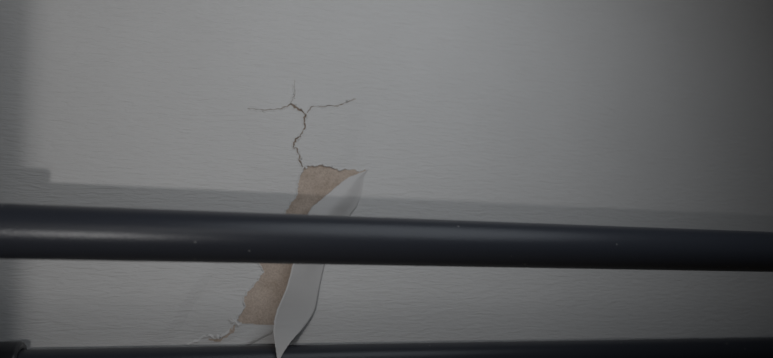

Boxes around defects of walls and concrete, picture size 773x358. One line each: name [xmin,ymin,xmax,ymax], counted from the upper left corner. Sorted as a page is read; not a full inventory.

crack [247,80,356,169]
peeling [283,163,368,216]
peeling [187,263,325,358]